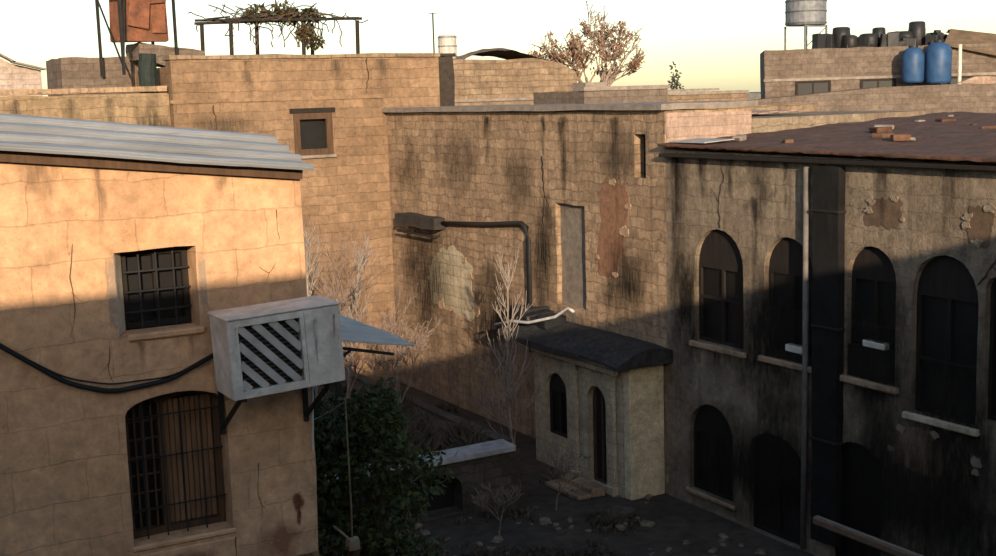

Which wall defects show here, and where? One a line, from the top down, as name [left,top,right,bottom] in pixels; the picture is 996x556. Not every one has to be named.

flaking render [863,196,905,230]
flaking render [961,203,996,249]
leakage [409,240,441,323]
leakage [534,211,550,298]
leakage [609,257,640,301]
crack [978,259,996,286]
leakage [478,266,511,347]